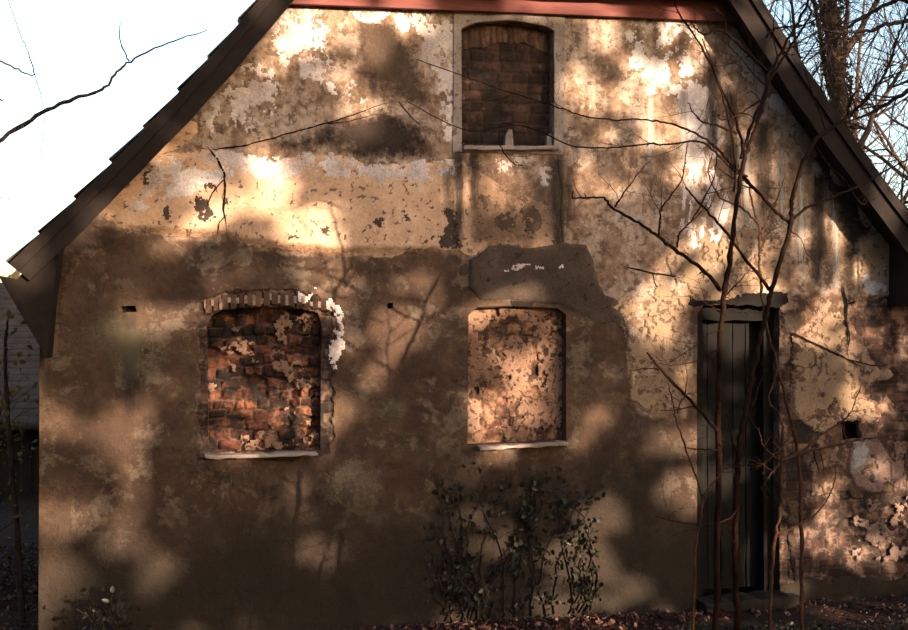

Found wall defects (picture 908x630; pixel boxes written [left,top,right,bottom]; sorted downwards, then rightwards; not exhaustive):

crack [205,101,424,233]
flaking render [100,6,556,258]
damp [281,109,432,163]
damp [360,24,430,110]
damp [705,52,785,223]
damp [797,150,870,291]
spalling [778,203,908,584]